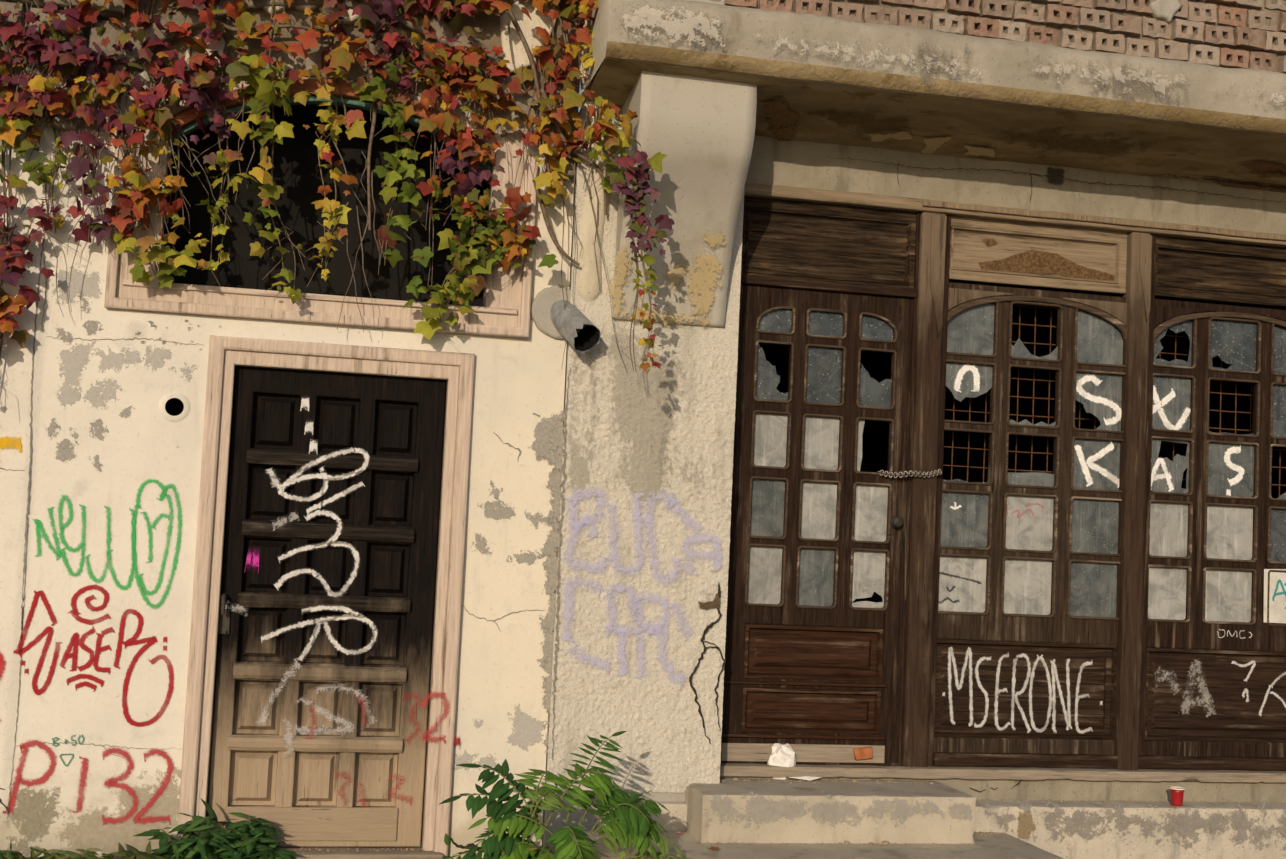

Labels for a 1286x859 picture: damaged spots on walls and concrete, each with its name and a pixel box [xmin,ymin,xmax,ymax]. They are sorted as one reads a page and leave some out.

peeling [868,131,996,157]
peeling [607,229,725,328]
peeling [48,265,197,472]
crack [0,129,201,828]
flaking render [473,411,565,757]
crack [689,583,726,742]
peeling [455,750,496,770]